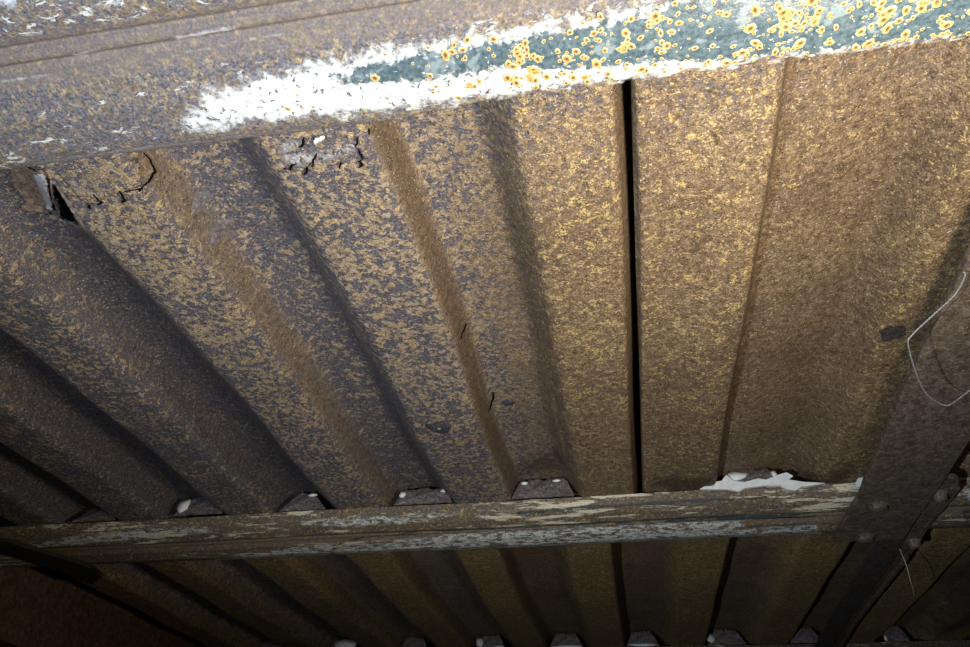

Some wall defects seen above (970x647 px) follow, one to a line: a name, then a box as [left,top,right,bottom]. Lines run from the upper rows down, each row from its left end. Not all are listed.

peeling [181,0,970,132]
crack [284,137,317,175]
crack [339,128,370,169]
peeling [700,470,825,492]
peeling [29,525,213,548]
peeling [177,498,191,513]
peeling [301,511,462,527]
peeling [200,520,829,561]